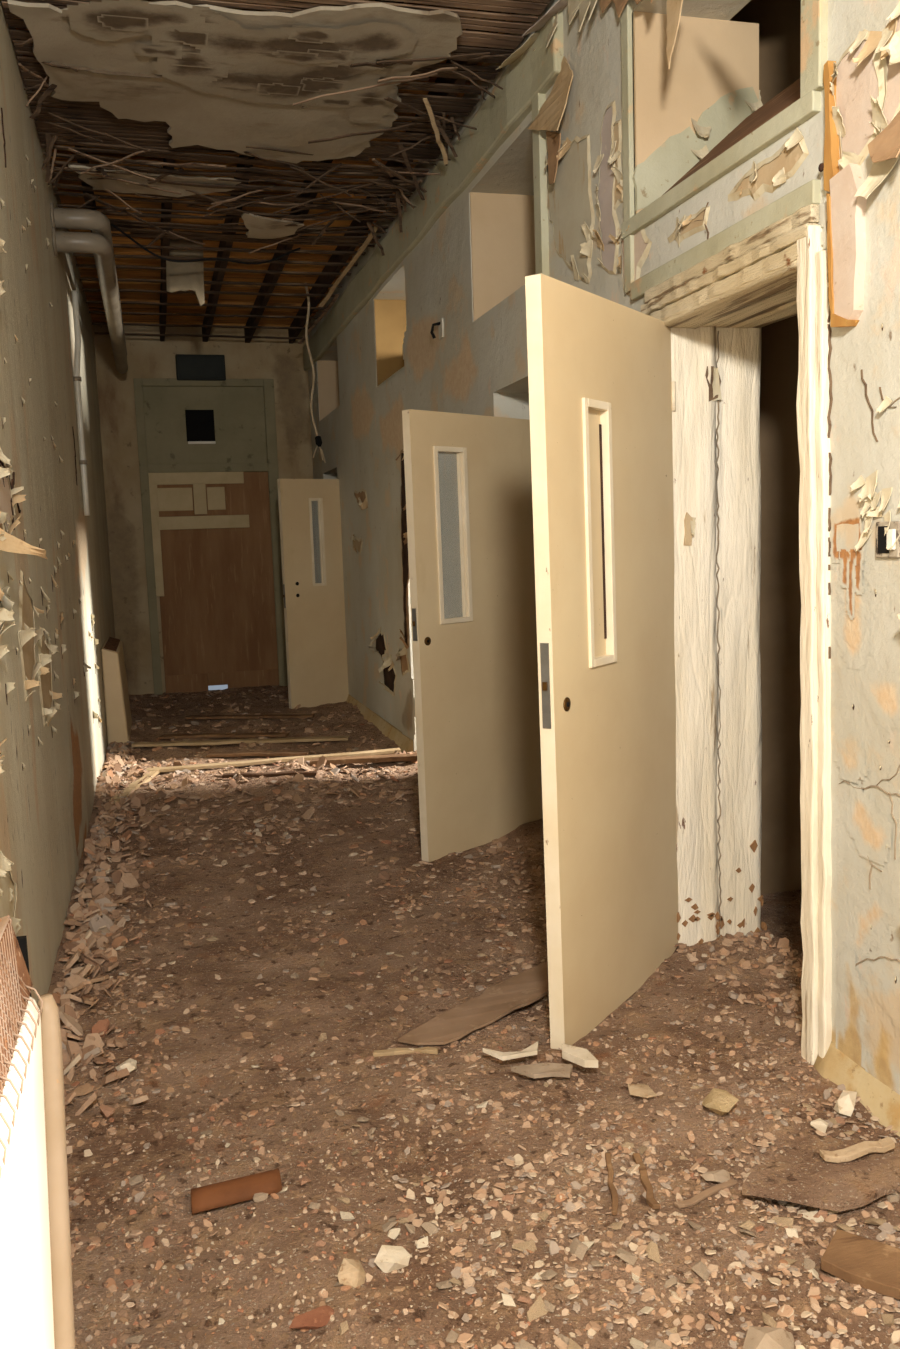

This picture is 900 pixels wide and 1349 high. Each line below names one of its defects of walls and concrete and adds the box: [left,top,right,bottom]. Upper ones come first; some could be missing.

leakage [62,0,418,123]
peeling [496,0,683,70]
peeling [830,0,900,199]
peeling [528,56,652,297]
peeling [668,206,711,247]
peeling [728,127,809,202]
peeling [0,448,99,746]
corrosion [830,515,866,620]
crack [839,765,900,889]
peeling [677,884,767,945]
leakage [831,946,900,1095]
crack [856,956,900,966]